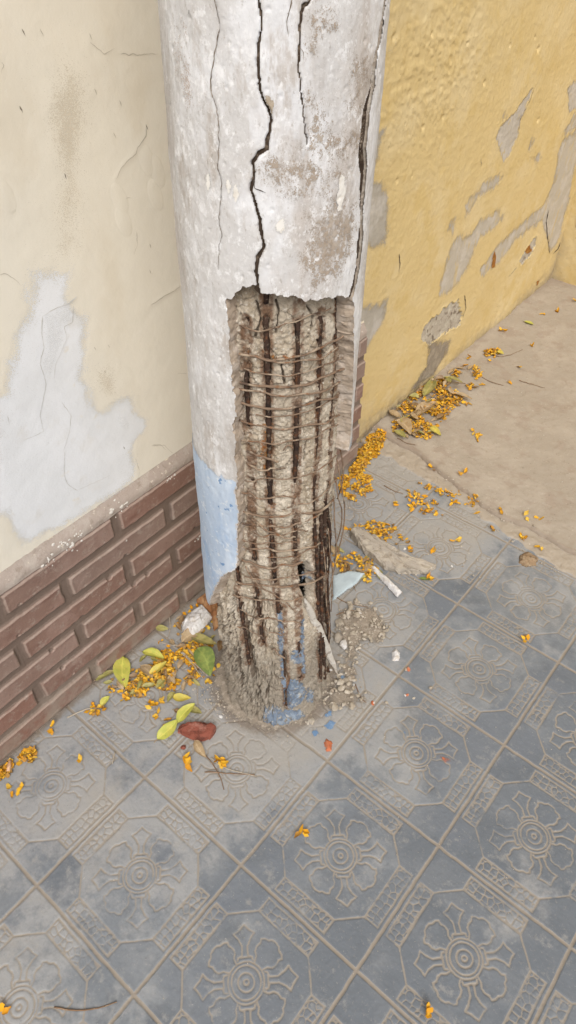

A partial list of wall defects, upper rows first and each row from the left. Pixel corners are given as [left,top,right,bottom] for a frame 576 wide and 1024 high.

crack [210,0,222,265]
crack [250,0,311,294]
crack [349,0,386,297]
peeling [421,80,576,345]
peeling [0,262,147,546]
spalling [209,285,365,727]